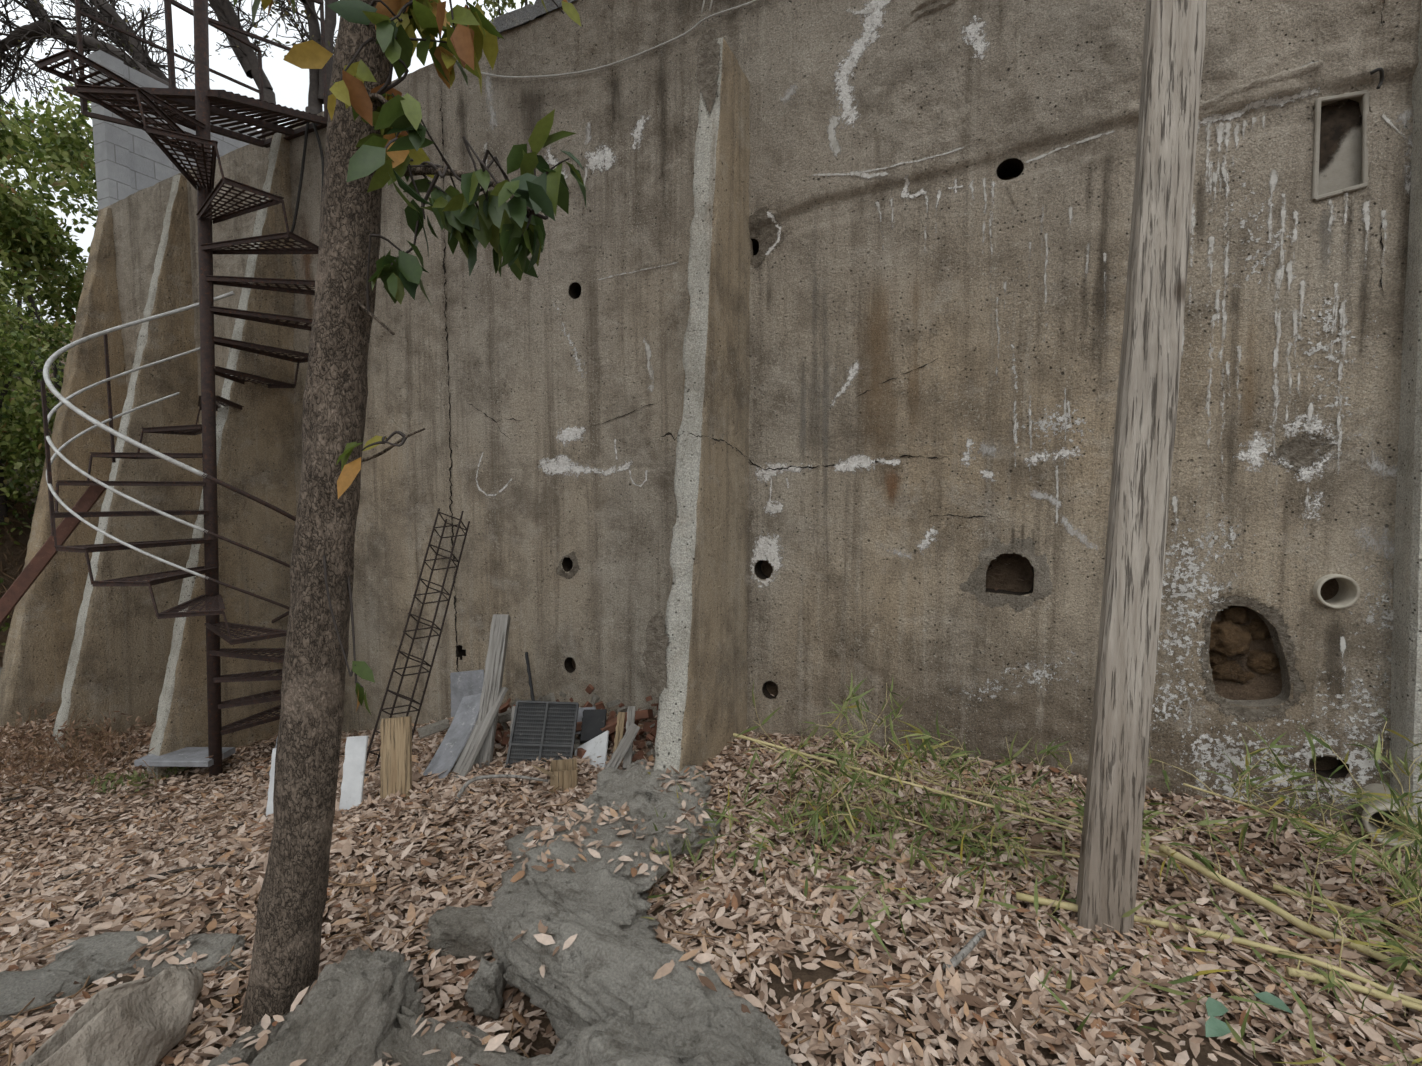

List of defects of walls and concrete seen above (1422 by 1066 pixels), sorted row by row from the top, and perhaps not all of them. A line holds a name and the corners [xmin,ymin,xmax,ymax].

water stain [1382,112,1413,253]
water stain [1190,87,1398,529]
crack [594,403,837,470]
crack [872,455,949,463]
spalling [1200,596,1306,722]
water stain [1149,496,1395,823]